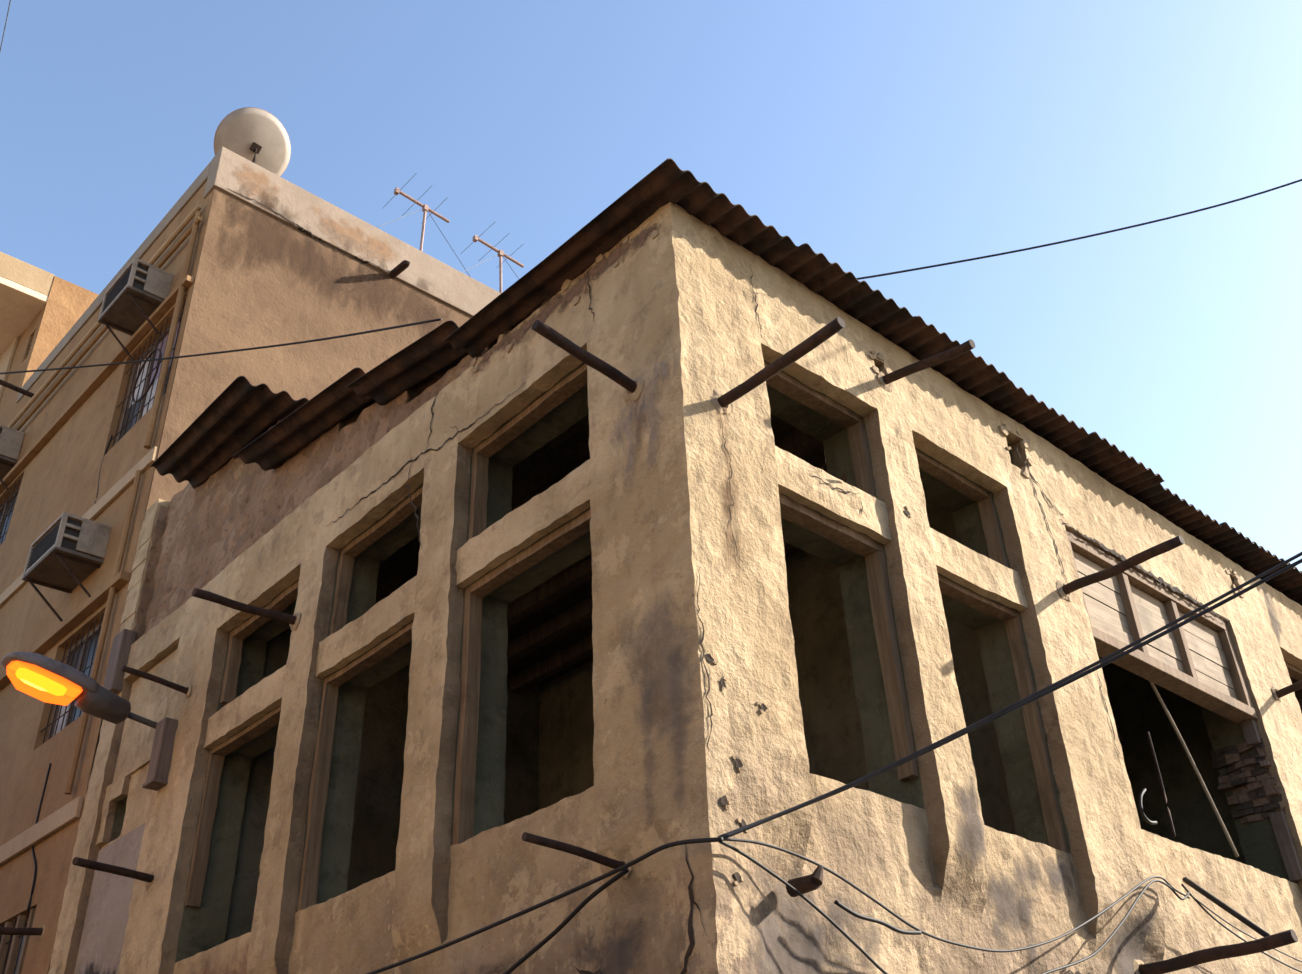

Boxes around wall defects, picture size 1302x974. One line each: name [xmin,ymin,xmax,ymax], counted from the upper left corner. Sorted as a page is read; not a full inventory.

water stain [231,198,437,331]
crack [710,415,747,568]
crack [1017,447,1231,621]
crack [685,567,725,760]
spalling [1217,739,1286,822]